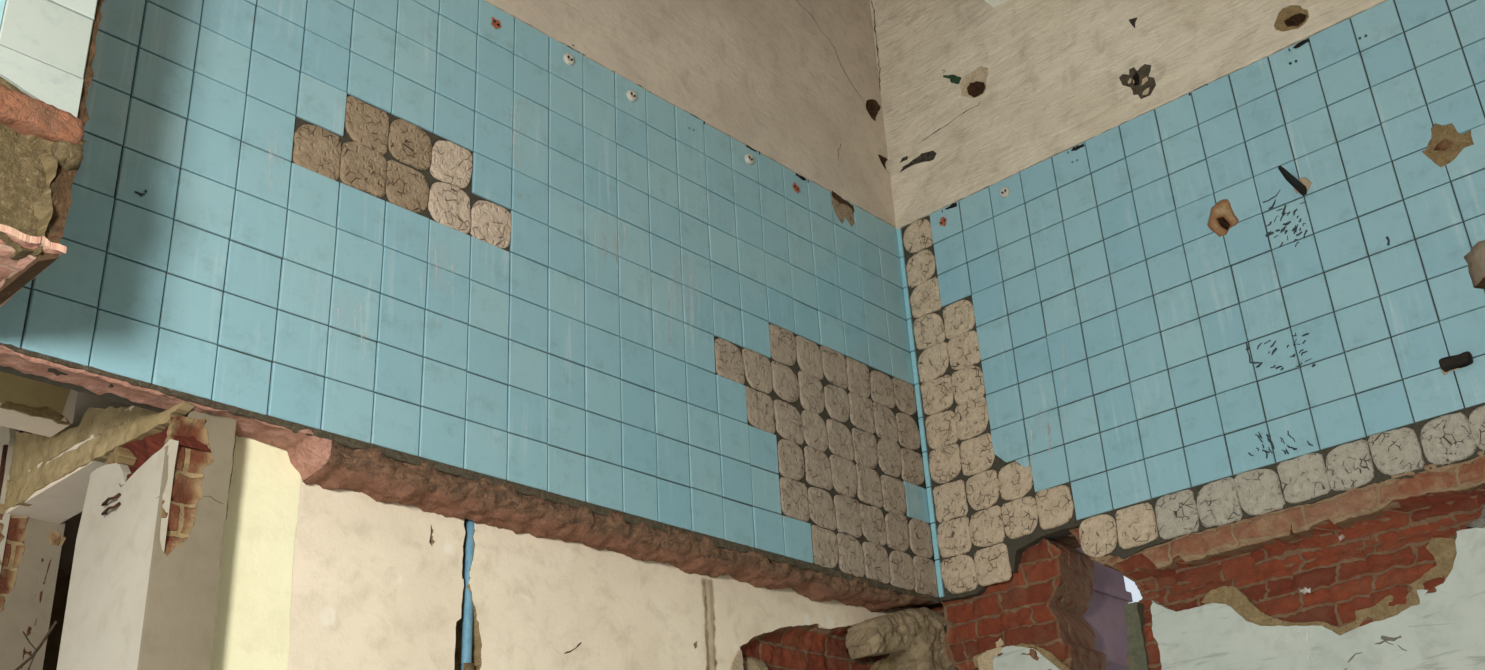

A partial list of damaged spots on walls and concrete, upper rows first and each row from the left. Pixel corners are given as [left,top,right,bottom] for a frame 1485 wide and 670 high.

spalling [77,0,104,125]
spalling [1274,5,1309,32]
spalling [0,164,81,305]
peeling [293,96,512,249]
spalling [831,191,855,226]
spalling [1208,199,1239,237]
spalling [1422,123,1474,167]
peeling [0,217,1485,670]